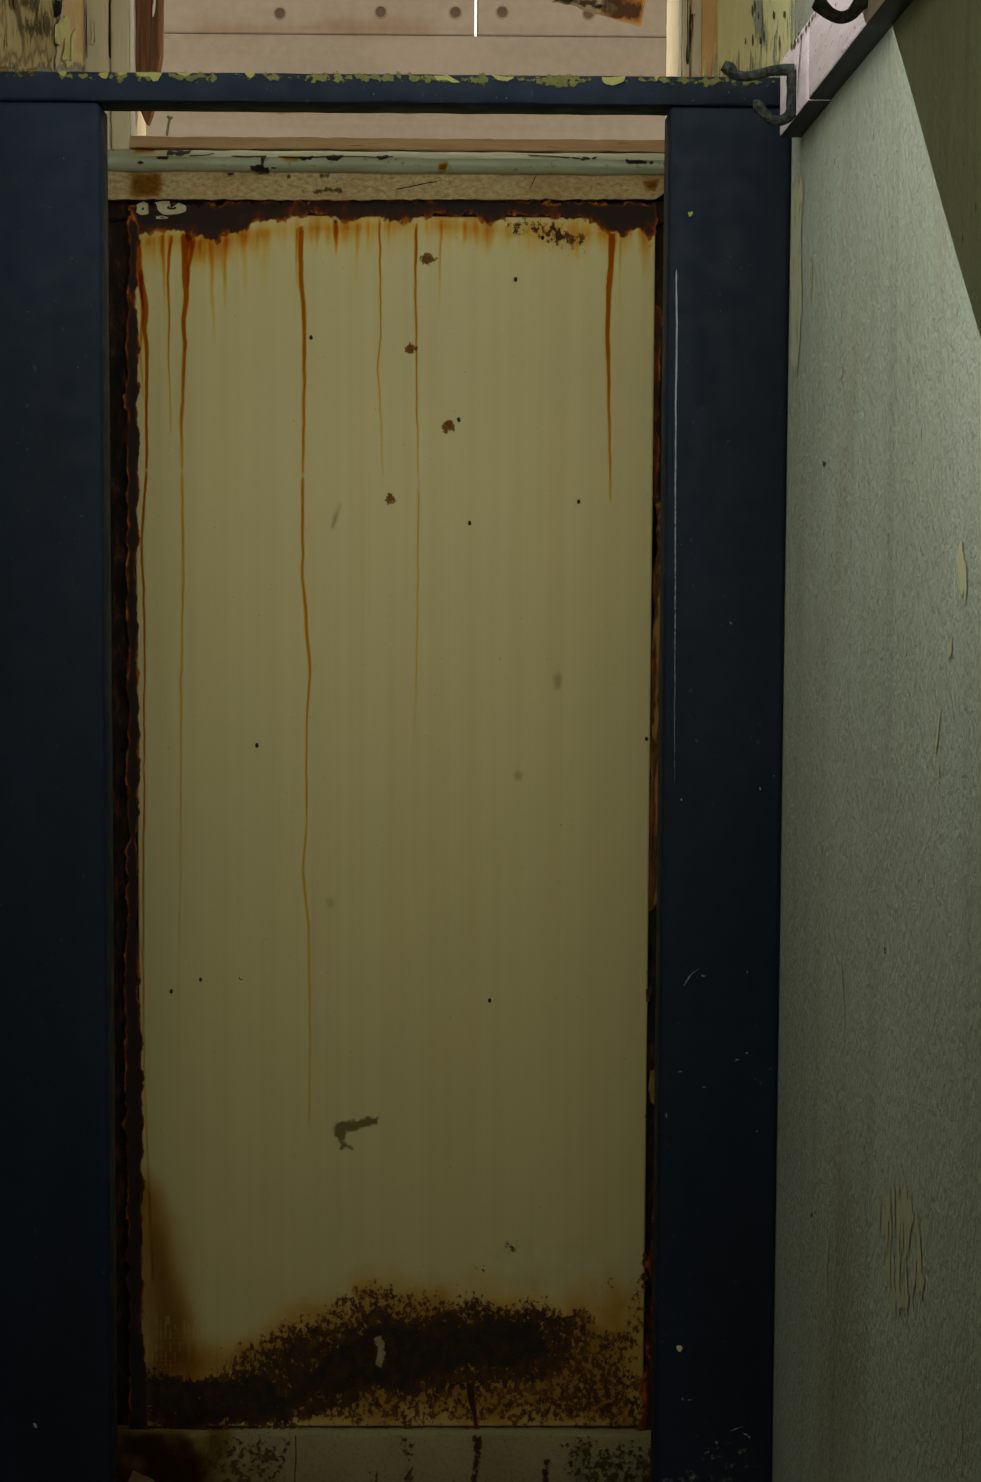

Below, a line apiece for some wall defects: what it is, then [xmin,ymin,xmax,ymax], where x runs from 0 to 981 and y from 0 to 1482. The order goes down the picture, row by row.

peeling [0,0,816,88]
rust [122,199,658,1482]
rust [645,305,663,911]